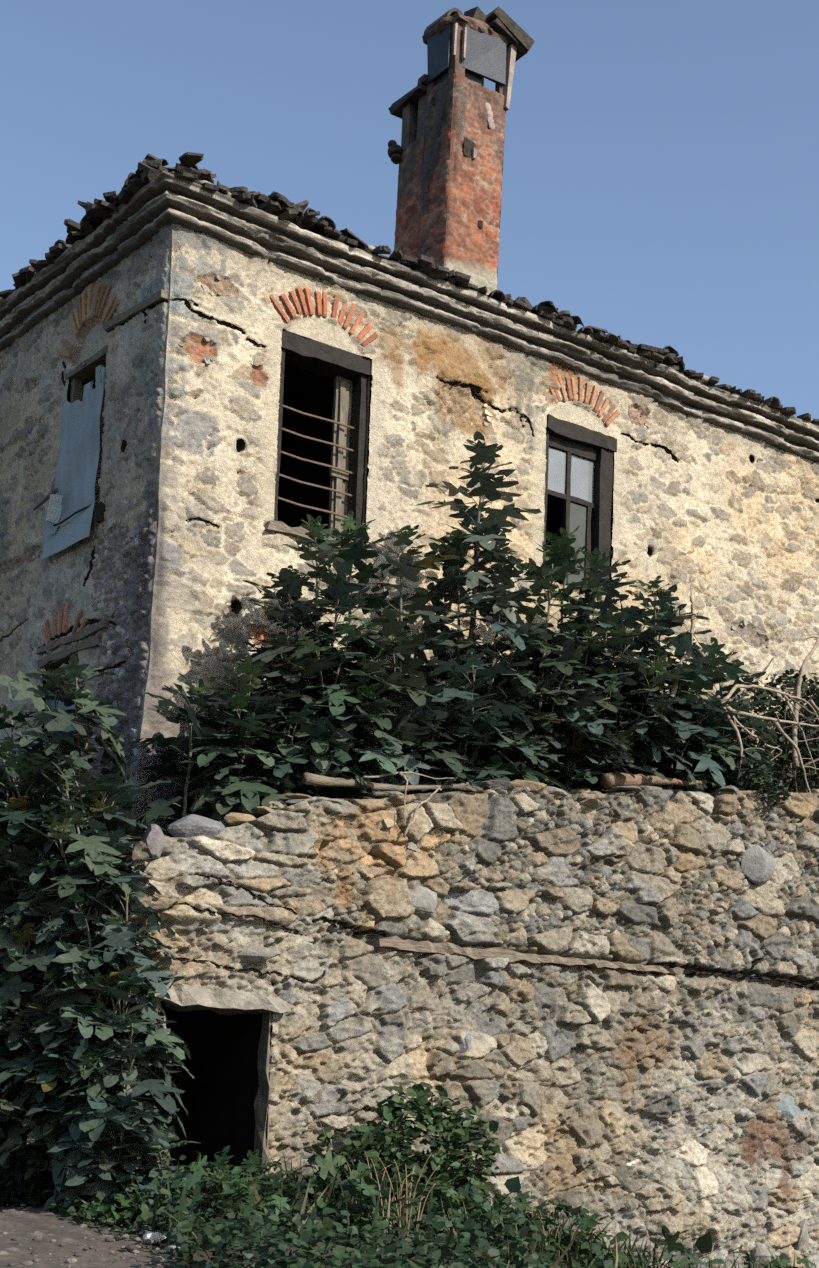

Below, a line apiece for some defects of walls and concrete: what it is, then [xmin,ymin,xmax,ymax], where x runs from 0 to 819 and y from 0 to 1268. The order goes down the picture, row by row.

crack [108,298,267,348]
crack [436,377,534,437]
crack [621,433,678,461]
leakage [102,474,192,795]
crack [646,957,819,991]